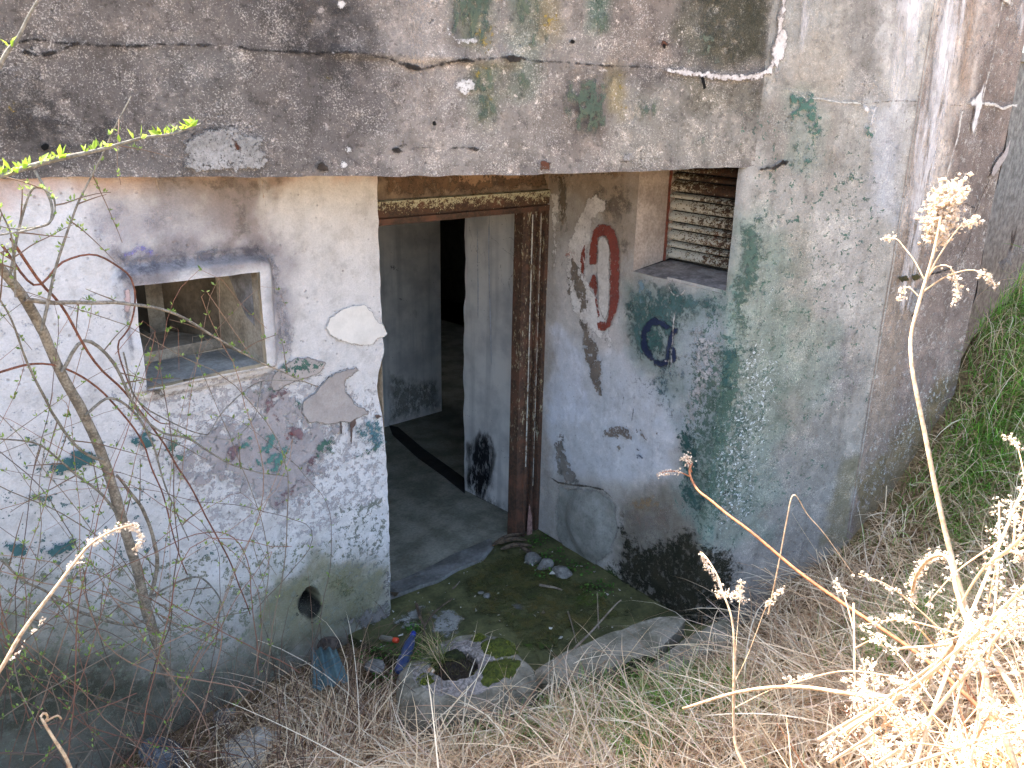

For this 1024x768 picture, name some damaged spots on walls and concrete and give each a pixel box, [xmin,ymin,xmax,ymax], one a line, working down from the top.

damp [700,0,770,64]
crack [4,0,1017,175]
spalling [183,125,268,173]
rust [385,174,547,196]
peeling [327,305,387,345]
peeling [550,193,613,396]
peeling [49,450,96,475]
peeling [131,357,389,517]
peeling [4,539,76,559]
damp [613,513,743,625]